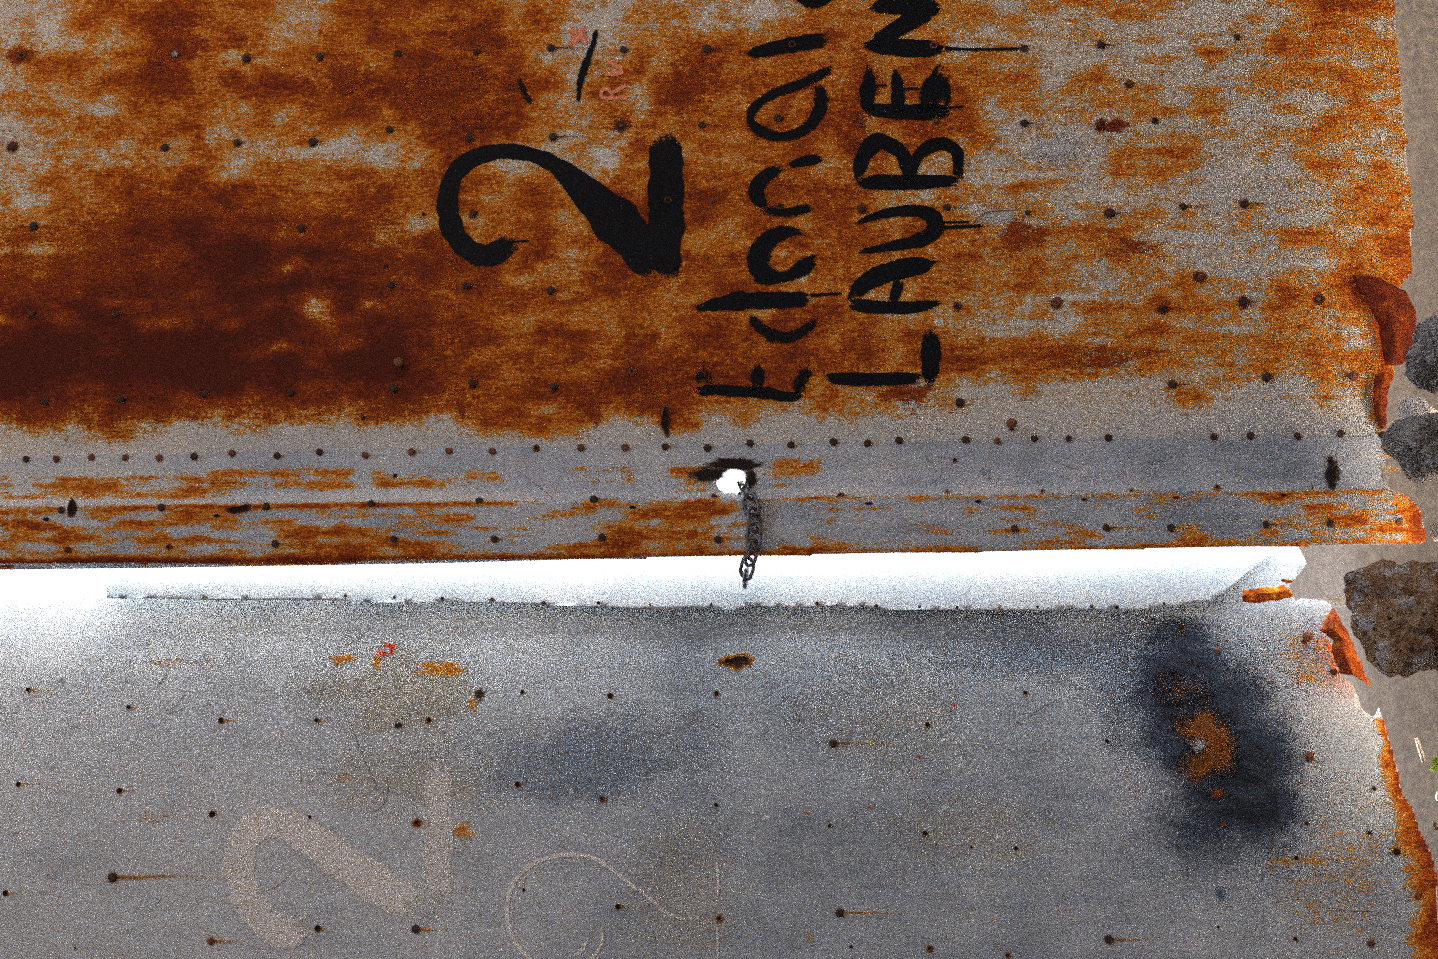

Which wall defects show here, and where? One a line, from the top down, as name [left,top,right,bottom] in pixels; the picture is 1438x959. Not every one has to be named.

rust [0,0,1426,569]
rust [717,653,754,671]
damp [952,616,1302,868]
rust [1253,718,1438,959]